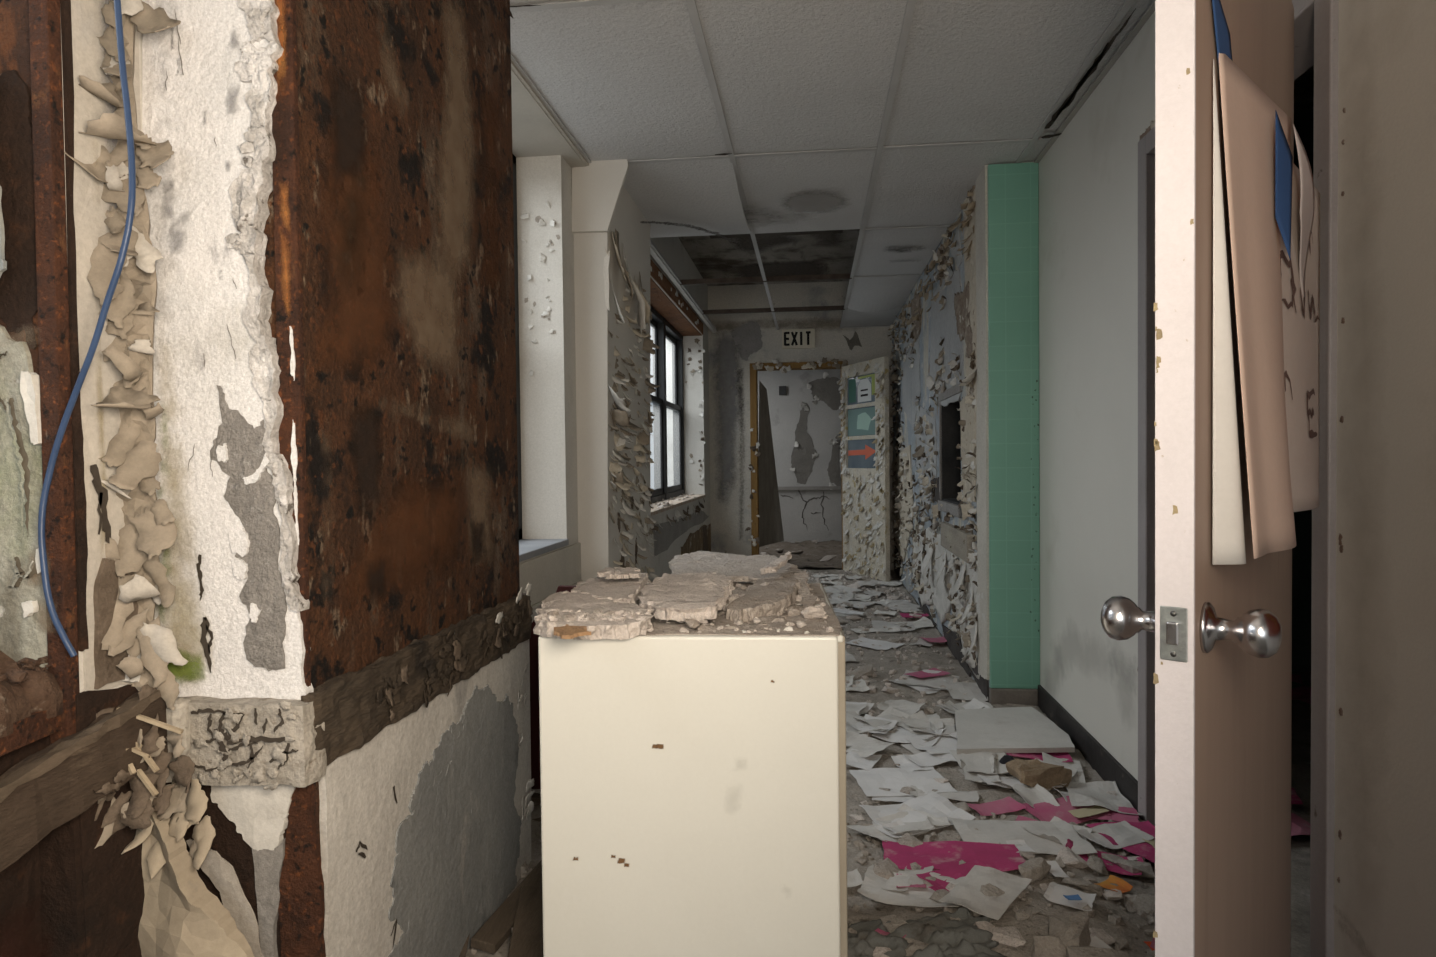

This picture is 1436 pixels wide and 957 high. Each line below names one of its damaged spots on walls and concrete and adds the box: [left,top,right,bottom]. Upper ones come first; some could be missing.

crack [0,398,37,588]
corrosion [60,0,89,651]
peeling [64,0,310,957]
crack [196,554,213,673]
crack [191,708,299,772]
corrosion [276,0,285,72]
corrosion [402,8,473,364]
peeling [377,583,541,957]
peeling [603,228,711,582]
peeling [729,165,990,702]